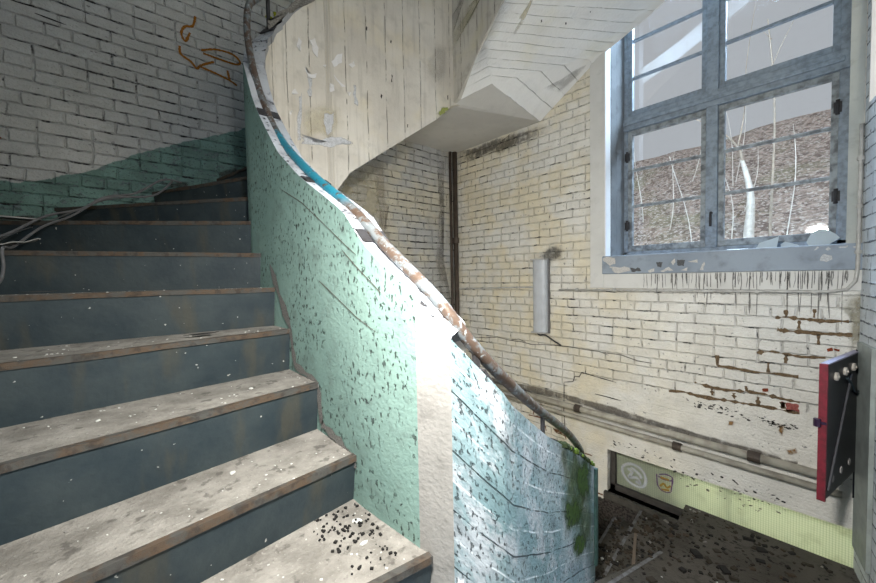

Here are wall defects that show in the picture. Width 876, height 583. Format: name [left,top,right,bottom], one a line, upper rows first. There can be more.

peeling [290,37,358,147]
peeling [603,257,705,273]
damp [643,270,848,318]
damp [841,297,861,342]
spalling [715,309,852,379]
spalling [669,382,800,430]